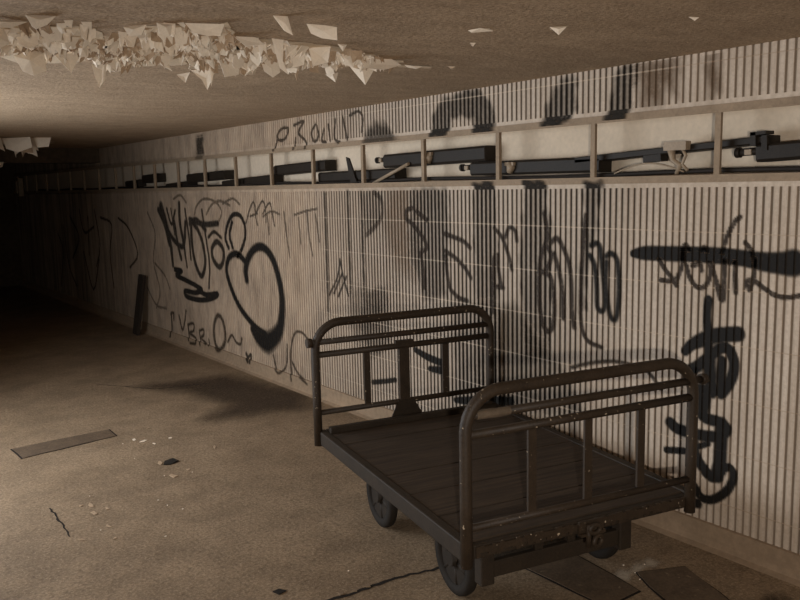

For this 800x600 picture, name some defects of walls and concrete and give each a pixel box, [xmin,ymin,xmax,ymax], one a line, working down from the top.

peeling [0,15,431,90]
peeling [0,137,52,157]
crack [49,508,70,537]
crack [327,566,439,600]